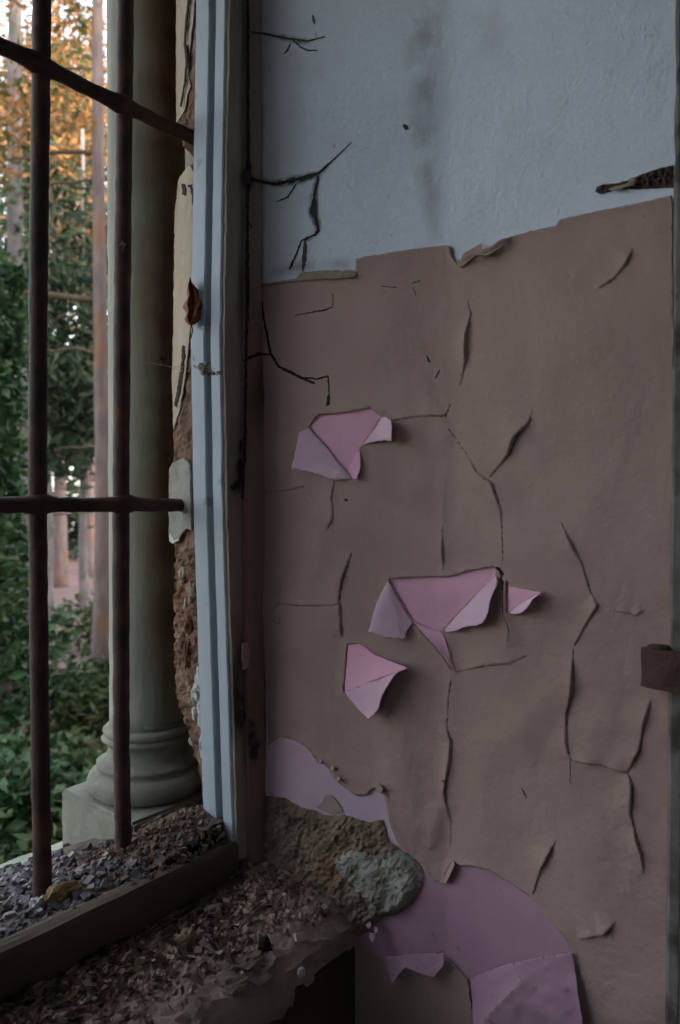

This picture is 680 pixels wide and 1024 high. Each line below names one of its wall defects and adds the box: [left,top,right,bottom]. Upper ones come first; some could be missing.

crack [247,15,326,54]
crack [246,143,351,270]
crack [243,301,330,406]
crack [295,294,334,316]
spalling [595,0,680,652]
crack [405,405,531,481]
spalling [665,692,680,1024]